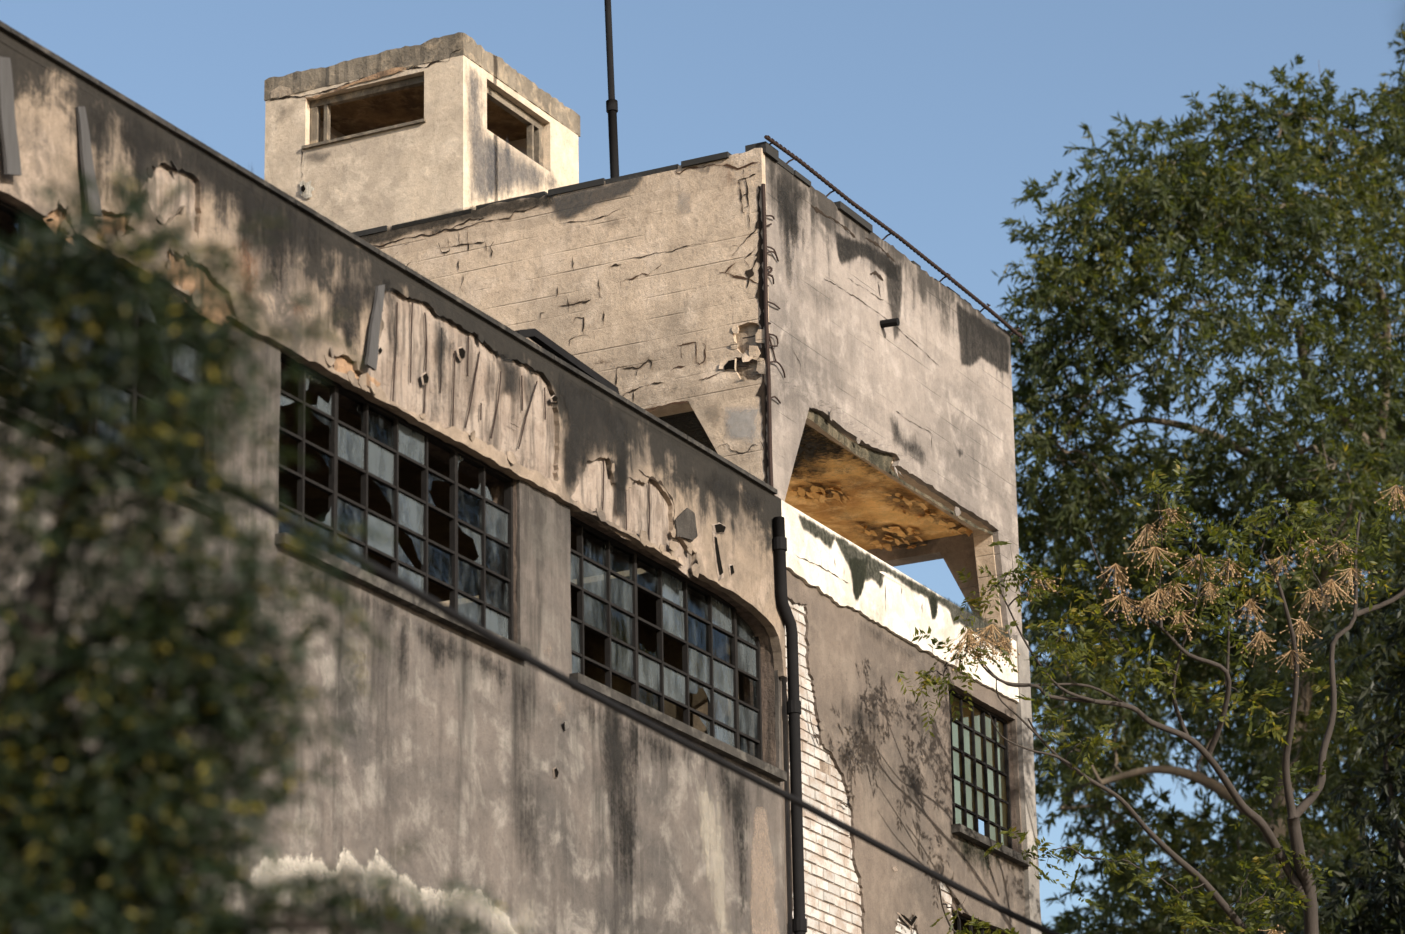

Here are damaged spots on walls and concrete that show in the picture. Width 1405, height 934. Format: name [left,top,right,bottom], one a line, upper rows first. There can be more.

water stain [360,73,642,243]
crack [373,207,534,292]
crack [540,209,720,411]
crack [675,162,760,284]
water stain [774,180,804,267]
water stain [836,232,902,337]
water stain [957,303,1009,372]
water stain [553,378,628,514]
water stain [800,516,1011,654]
peeling [751,599,862,934]
peeling [895,916,916,934]
peeling [940,882,962,921]